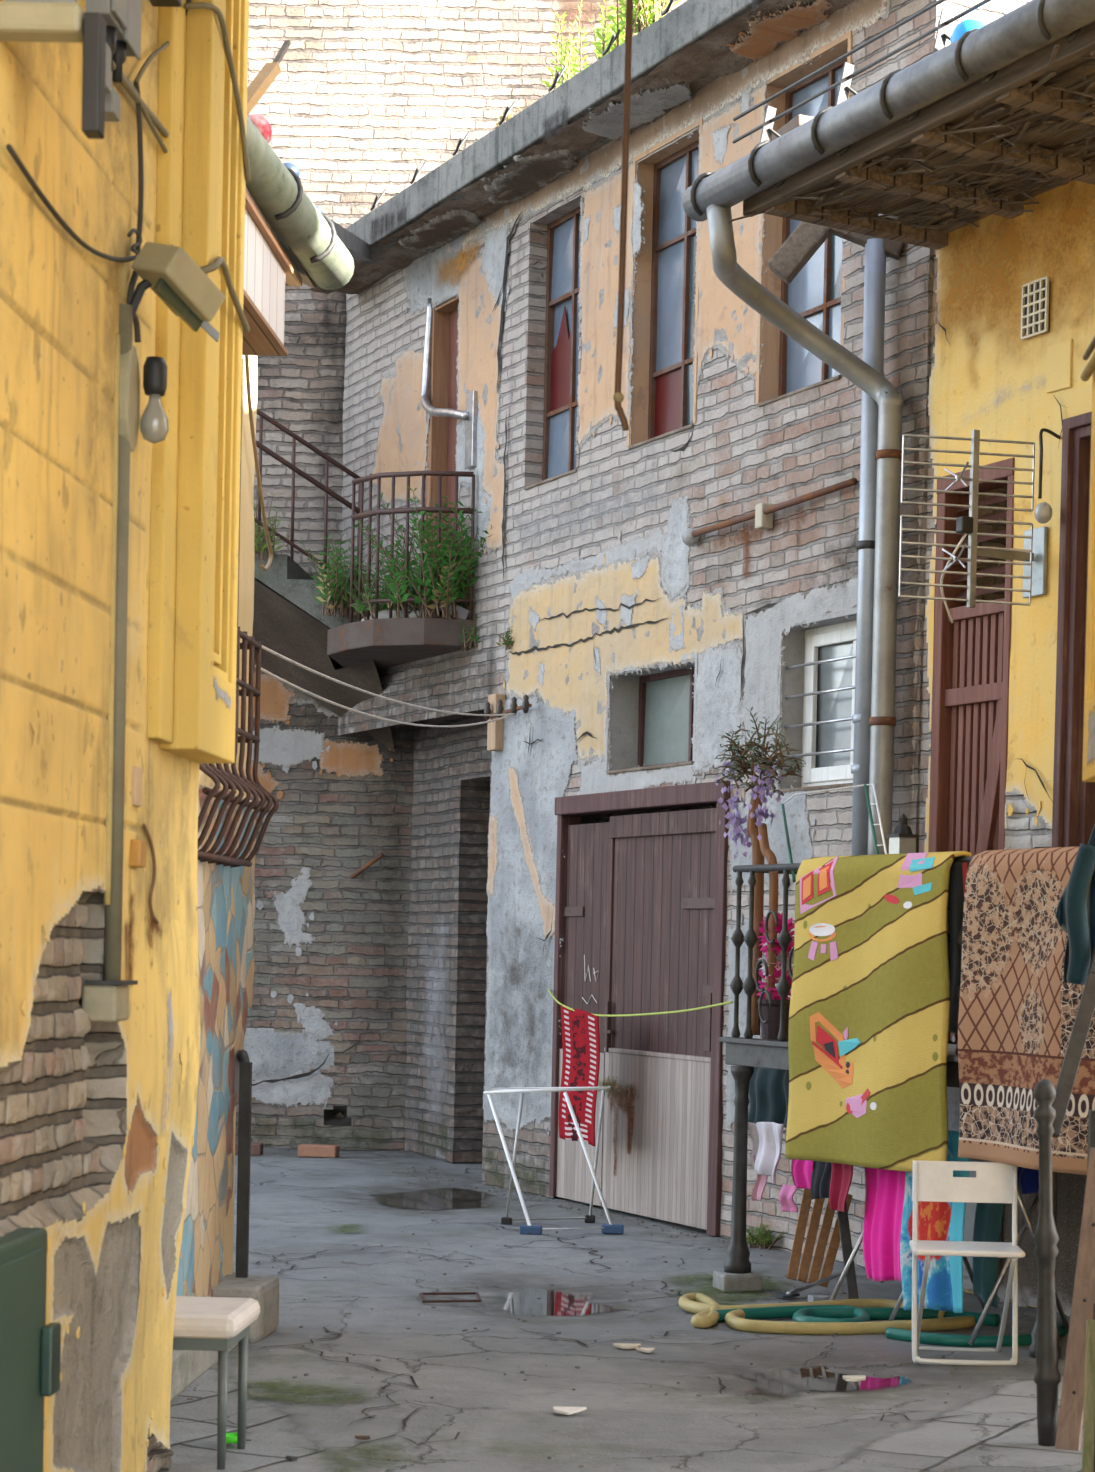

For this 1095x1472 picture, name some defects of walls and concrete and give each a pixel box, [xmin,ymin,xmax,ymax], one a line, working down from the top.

flaking render [398,0,892,555]
flaking render [372,348,432,506]
corrosion [721,512,803,576]
crack [508,598,667,664]
flaking render [250,659,399,821]
flaking render [483,494,858,1136]
flaking render [256,863,317,957]
flaking render [252,1069,352,1126]
spalling [0,886,194,1472]
flaking render [997,1167,1039,1308]
flaking render [1056,1172,1087,1317]
crack [295,1346,427,1435]